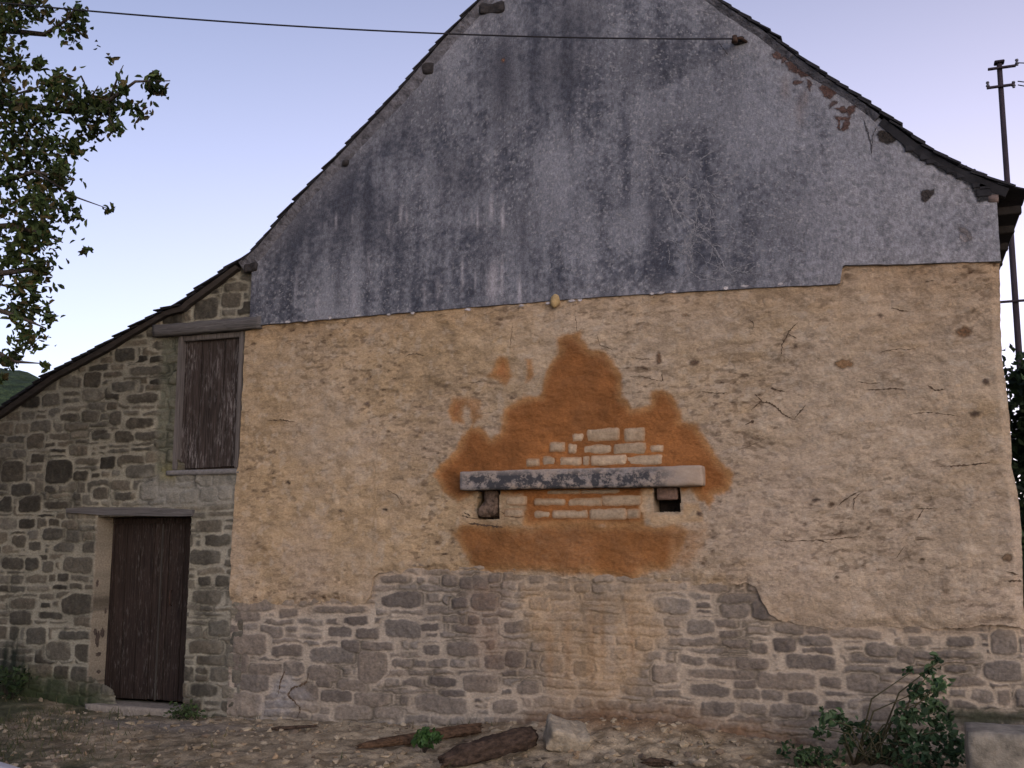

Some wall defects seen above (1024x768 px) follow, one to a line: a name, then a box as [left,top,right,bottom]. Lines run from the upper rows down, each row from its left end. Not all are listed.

damp [491,26,522,120]
peeling [772,51,856,131]
damp [459,180,534,306]
damp [639,167,669,294]
flaking render [526,427,664,467]
crack [741,387,805,449]
flaking render [504,489,642,520]